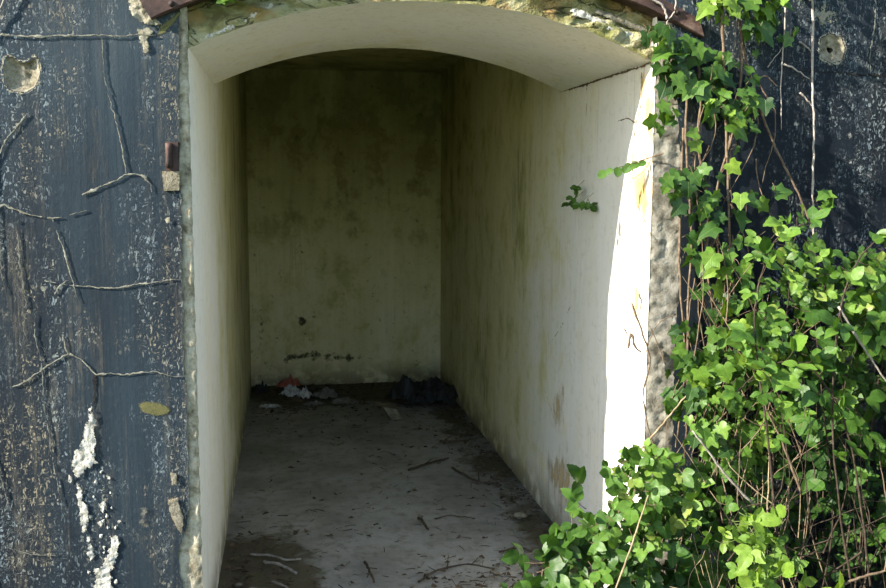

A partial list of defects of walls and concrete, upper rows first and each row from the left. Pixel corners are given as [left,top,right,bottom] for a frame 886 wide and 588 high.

spalling [128,0,162,53]
spalling [814,3,847,65]
spalling [1,54,42,95]
rust [632,78,653,217]